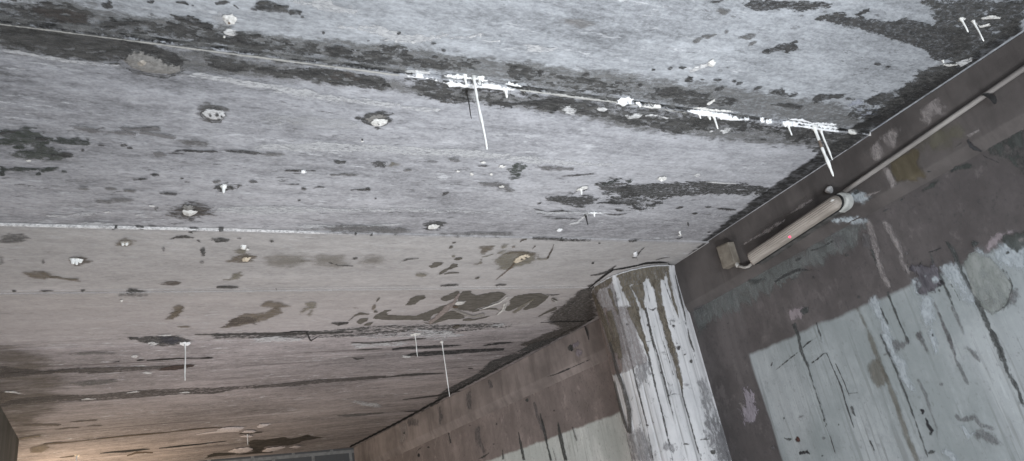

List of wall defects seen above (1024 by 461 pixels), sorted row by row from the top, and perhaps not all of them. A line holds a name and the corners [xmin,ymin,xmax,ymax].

spalling [124,51,184,79]
spalling [496,246,534,279]
damp [221,301,288,328]
peeling [347,291,559,328]